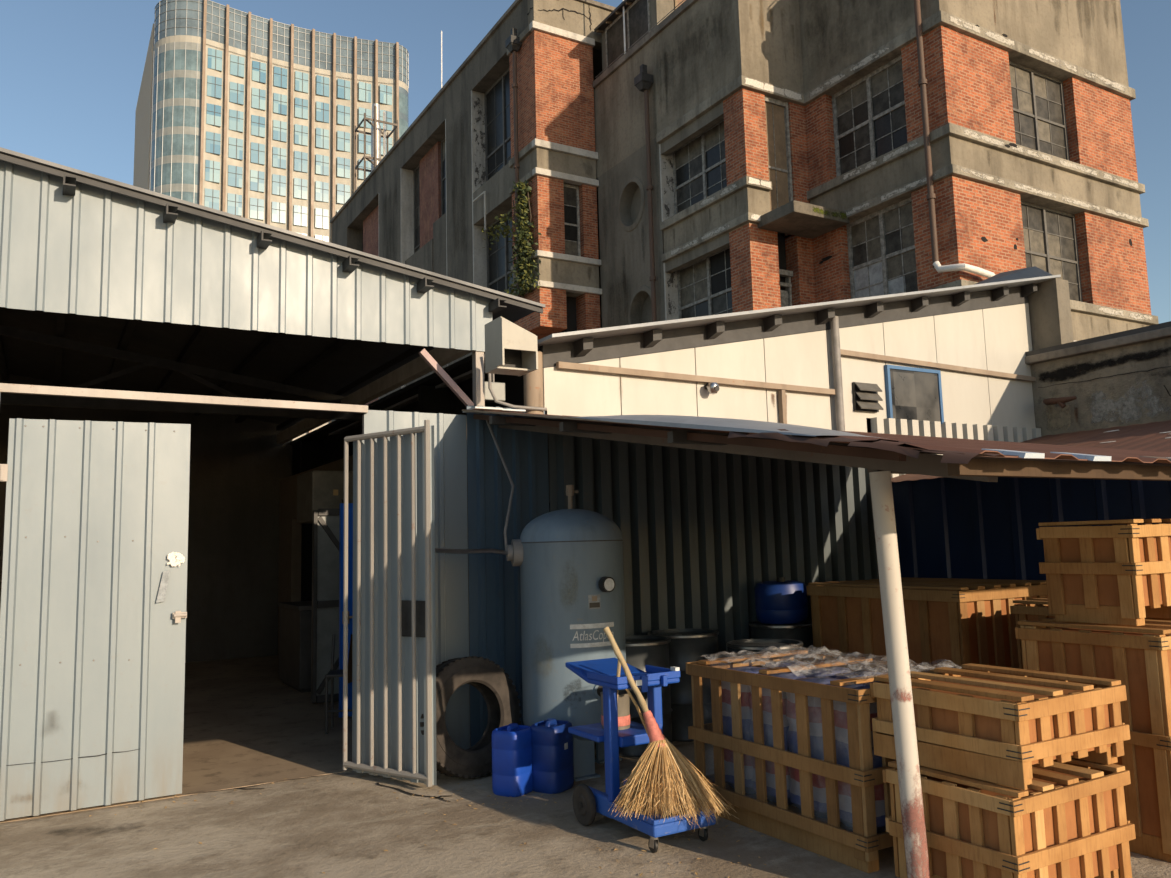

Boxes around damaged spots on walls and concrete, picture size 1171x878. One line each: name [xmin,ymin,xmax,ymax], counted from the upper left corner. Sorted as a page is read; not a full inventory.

crack [527,7,592,29]
crack [1038,366,1171,396]
corrosion [728,429,1006,464]